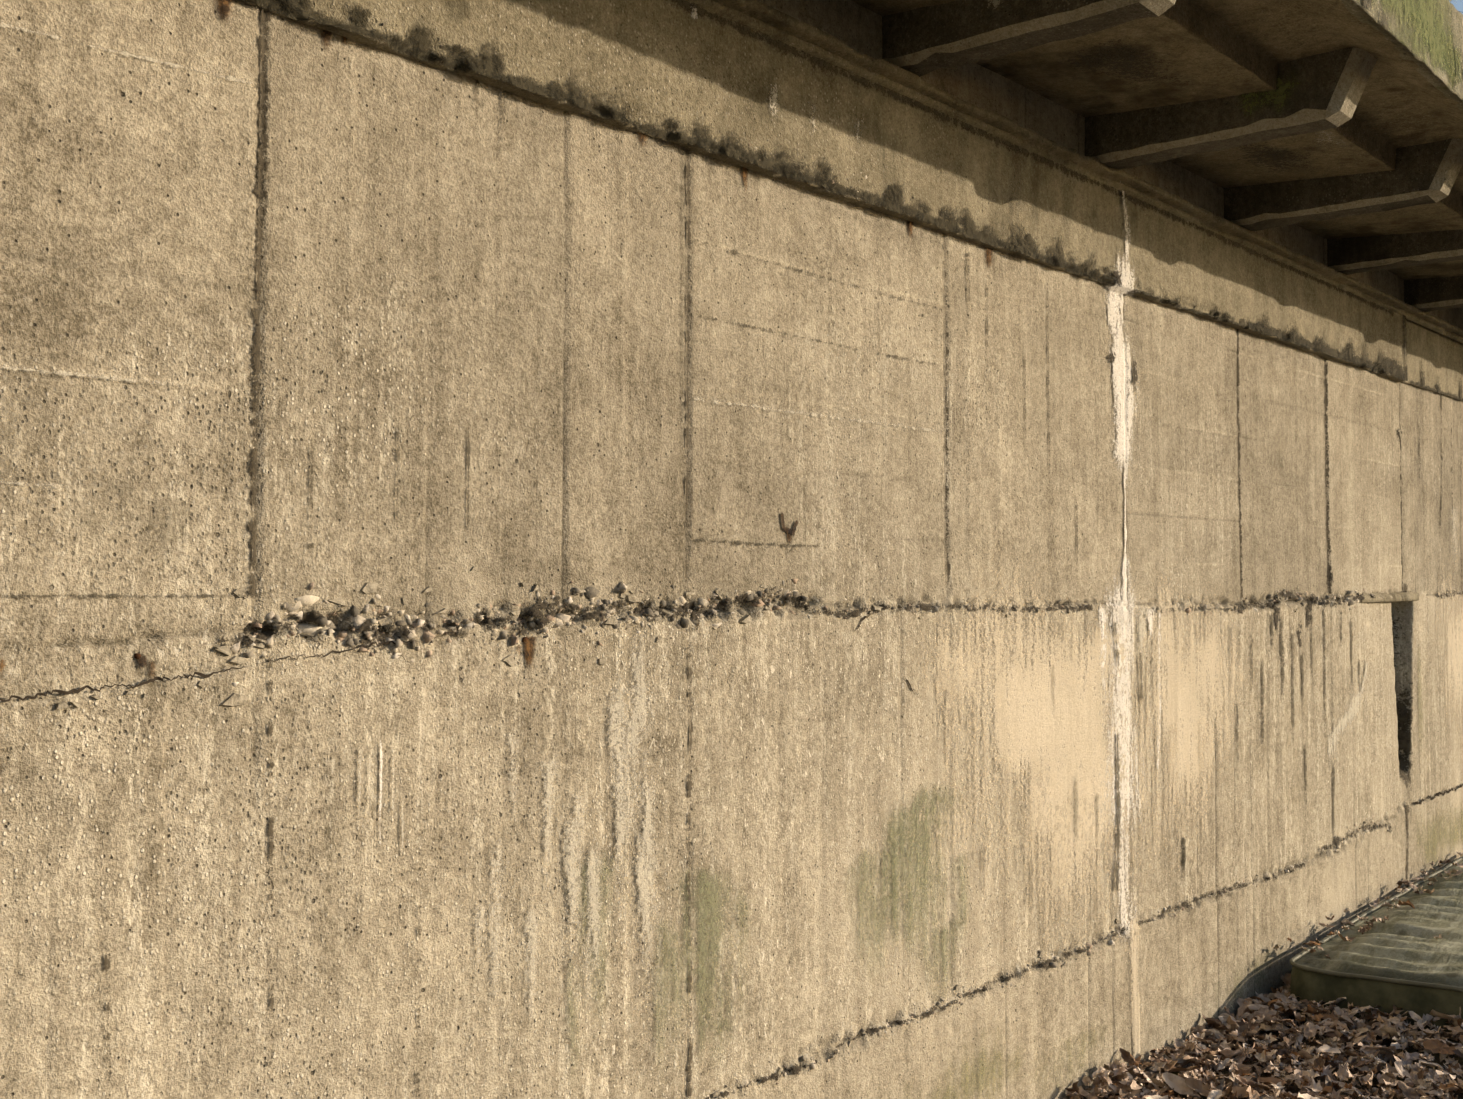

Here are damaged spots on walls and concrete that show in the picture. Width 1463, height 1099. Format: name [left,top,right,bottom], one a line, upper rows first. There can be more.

damp [1410,362,1463,401]
crack [0,635,418,710]
spalling [213,579,938,707]
spalling [963,599,1086,618]
damp [1435,508,1463,747]
crack [1413,784,1462,804]